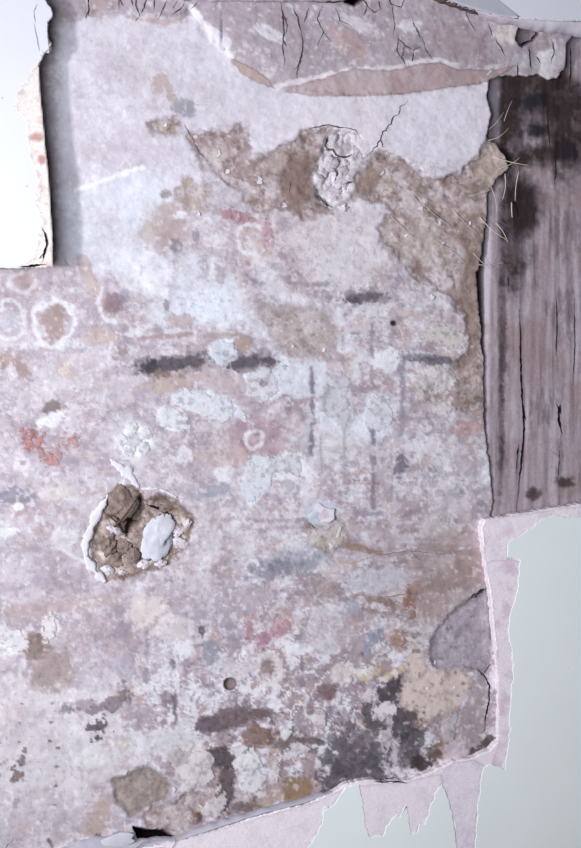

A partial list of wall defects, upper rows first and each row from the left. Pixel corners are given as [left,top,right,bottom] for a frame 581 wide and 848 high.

crack [280,0,432,78]
crack [466,13,571,86]
crack [310,101,408,159]
damp [500,74,581,291]
spalling [146,101,531,414]
peeling [152,387,247,430]
spalling [81,423,193,583]
peeling [61,748,341,848]
damp [209,749,256,818]
peeling [229,719,311,793]
damp [195,675,441,792]